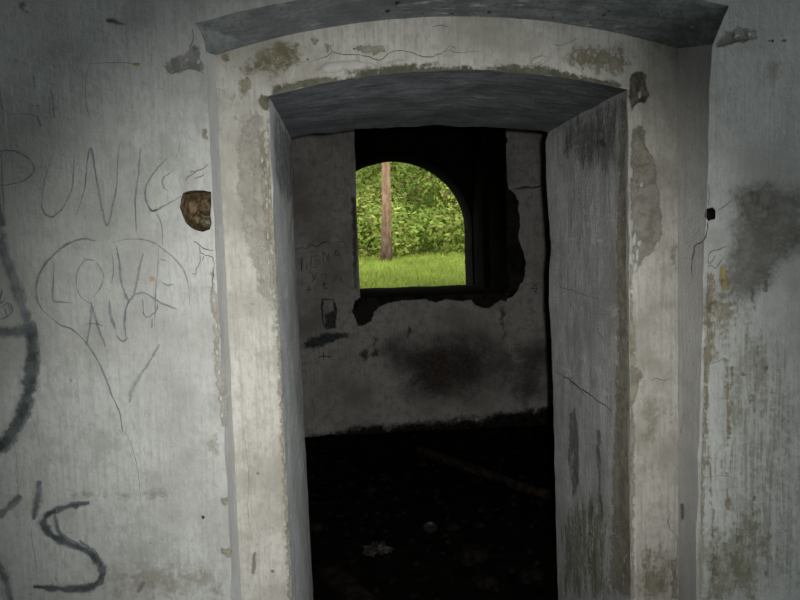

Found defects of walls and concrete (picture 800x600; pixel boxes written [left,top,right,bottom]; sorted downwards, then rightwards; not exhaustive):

flaking render [163,30,204,74]
flaking render [353,45,385,55]
crack [303,45,479,62]
flaking render [716,26,759,47]
flaking render [628,71,649,110]
spalling [180,190,212,232]
flaking render [352,128,544,326]
flaking render [630,126,662,273]
crack [691,187,733,298]
damp [713,182,800,338]
crack [556,372,611,411]